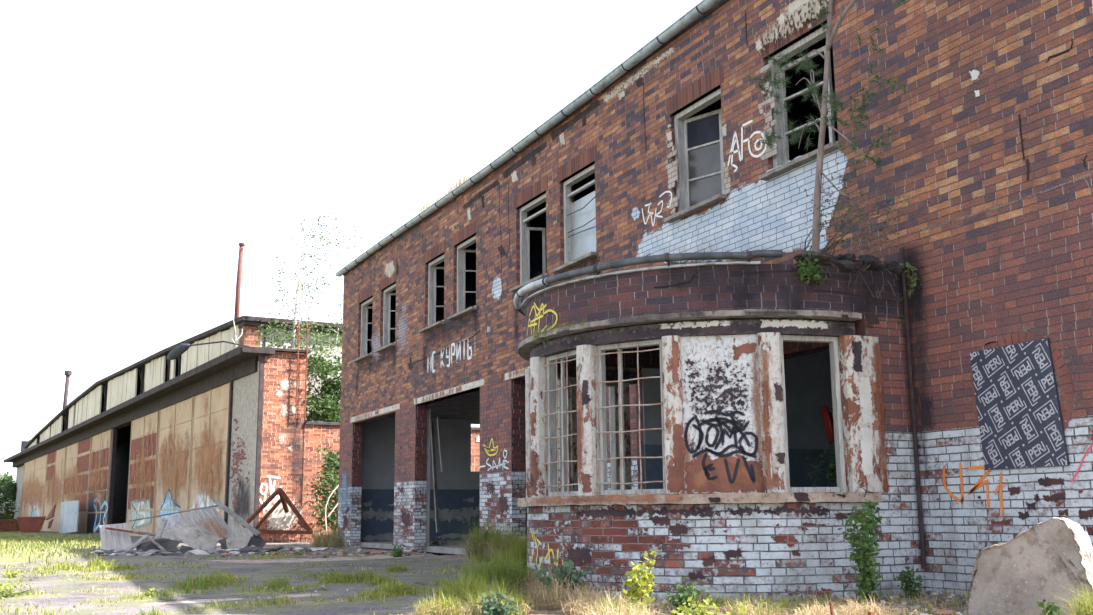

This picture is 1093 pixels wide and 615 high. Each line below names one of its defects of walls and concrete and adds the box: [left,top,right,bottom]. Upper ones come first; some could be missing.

spalling [755,0,829,161]
peeling [760,319,828,329]
peeling [659,320,760,431]
corrosion [23,442,107,514]
corrosion [130,425,222,513]
flaking render [229,419,250,508]
peeling [340,485,416,542]
peeling [430,481,511,539]
peeling [530,412,863,582]
peeling [784,587,834,599]